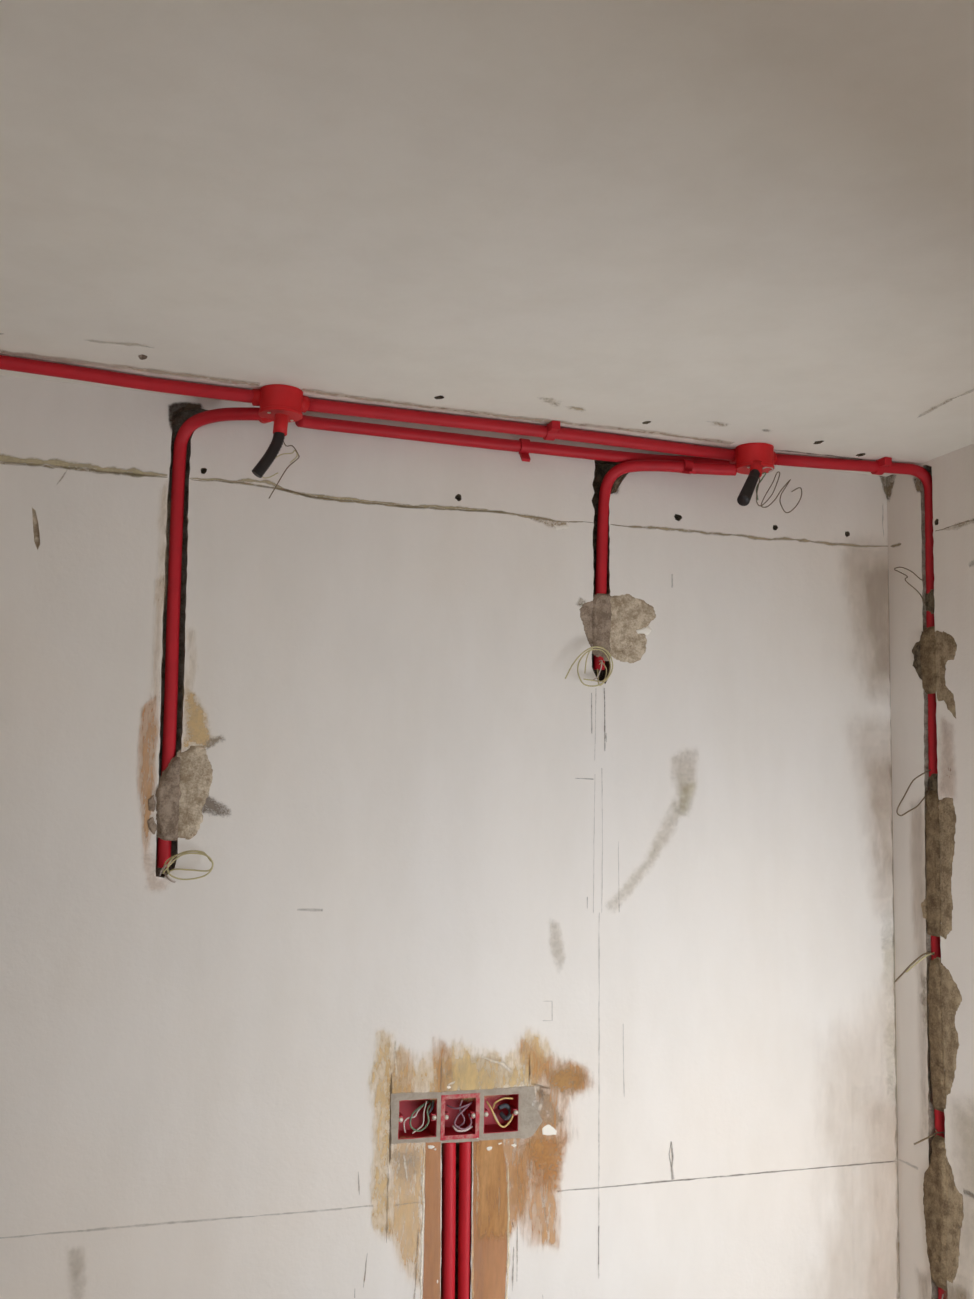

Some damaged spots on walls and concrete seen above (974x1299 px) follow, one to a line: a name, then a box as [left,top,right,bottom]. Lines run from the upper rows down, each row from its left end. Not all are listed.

spalling [175,746,213,840]
spalling [542,1124,557,1136]
flaking render [420,1142,441,1299]
flaking render [471,1138,517,1299]